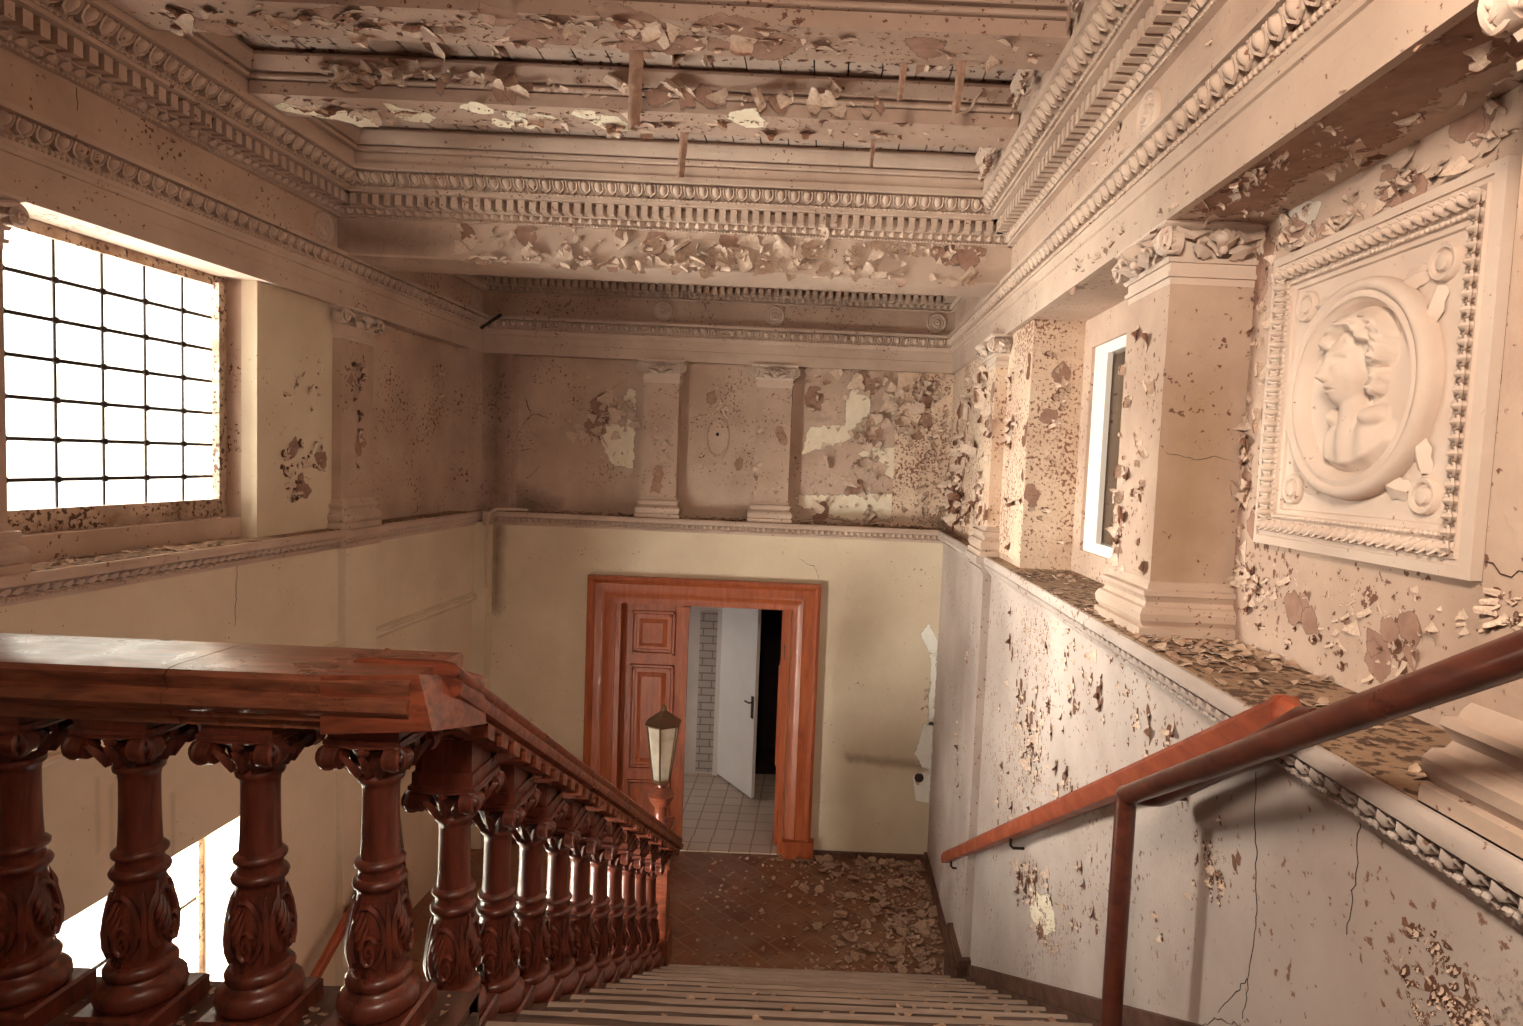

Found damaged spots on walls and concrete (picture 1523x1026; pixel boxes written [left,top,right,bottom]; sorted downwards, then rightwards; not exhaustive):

peeling [150,2,1050,182]
peeling [449,222,987,288]
peeling [280,428,327,503]
peeling [345,355,370,469]
peeling [566,373,674,495]
peeling [695,351,1071,544]
peeling [1065,11,1523,685]
peeling [912,624,938,803]
peeling [990,604,1174,825]
peeling [1009,857,1105,957]
crack [1203,772,1258,1026]
peeling [1399,917,1492,1026]